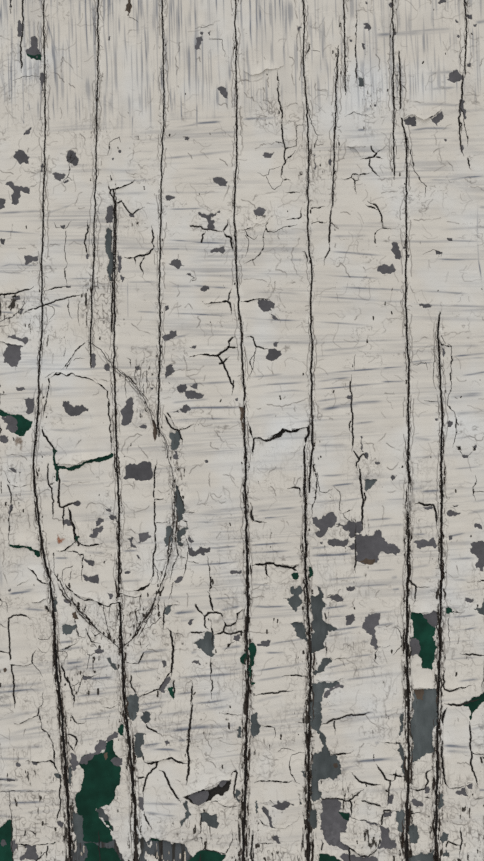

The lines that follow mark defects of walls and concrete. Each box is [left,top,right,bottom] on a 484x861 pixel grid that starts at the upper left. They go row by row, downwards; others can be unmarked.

crack [92,23,100,141]
crack [201,24,239,141]
peeling [0,181,30,209]
peeling [3,335,28,367]
peeling [176,383,204,413]
crack [200,315,252,858]
peeling [312,512,400,565]
crack [301,307,484,861]
peeling [470,541,484,572]
peeling [255,586,449,861]
peeling [70,732,123,792]
peeling [180,780,241,829]